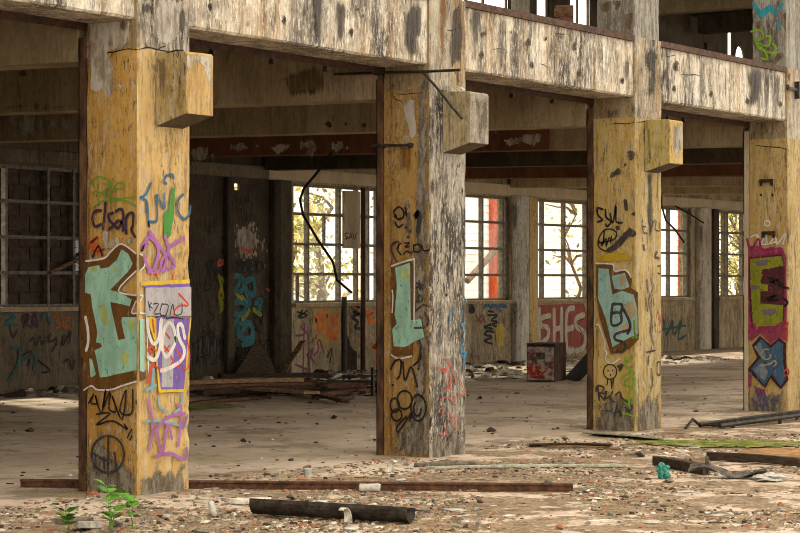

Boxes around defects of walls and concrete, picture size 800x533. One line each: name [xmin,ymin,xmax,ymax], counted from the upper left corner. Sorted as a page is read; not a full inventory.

damp [306,0,322,39]
damp [337,2,345,41]
damp [406,6,421,54]
damp [473,10,481,60]
peeling [86,20,130,97]
peeling [187,54,212,85]
damp [750,70,790,105]
peeling [403,99,418,144]
damp [395,80,463,458]